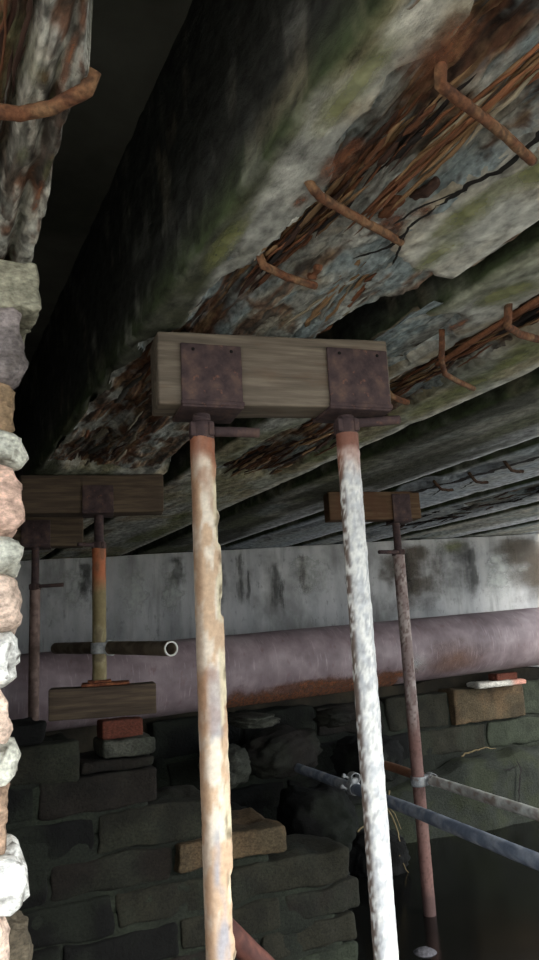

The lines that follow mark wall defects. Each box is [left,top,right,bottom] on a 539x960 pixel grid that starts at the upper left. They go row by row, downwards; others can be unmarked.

rust [60,36,78,88]
rust [412,15,470,70]
rust [450,65,476,91]
spalling [447,0,539,139]
rust [472,43,539,117]
spalling [171,59,509,339]
rust [237,92,484,297]
crack [353,131,539,265]
spalling [48,337,190,469]
spalling [373,294,539,416]
damp [381,546,440,596]
damp [460,539,539,590]